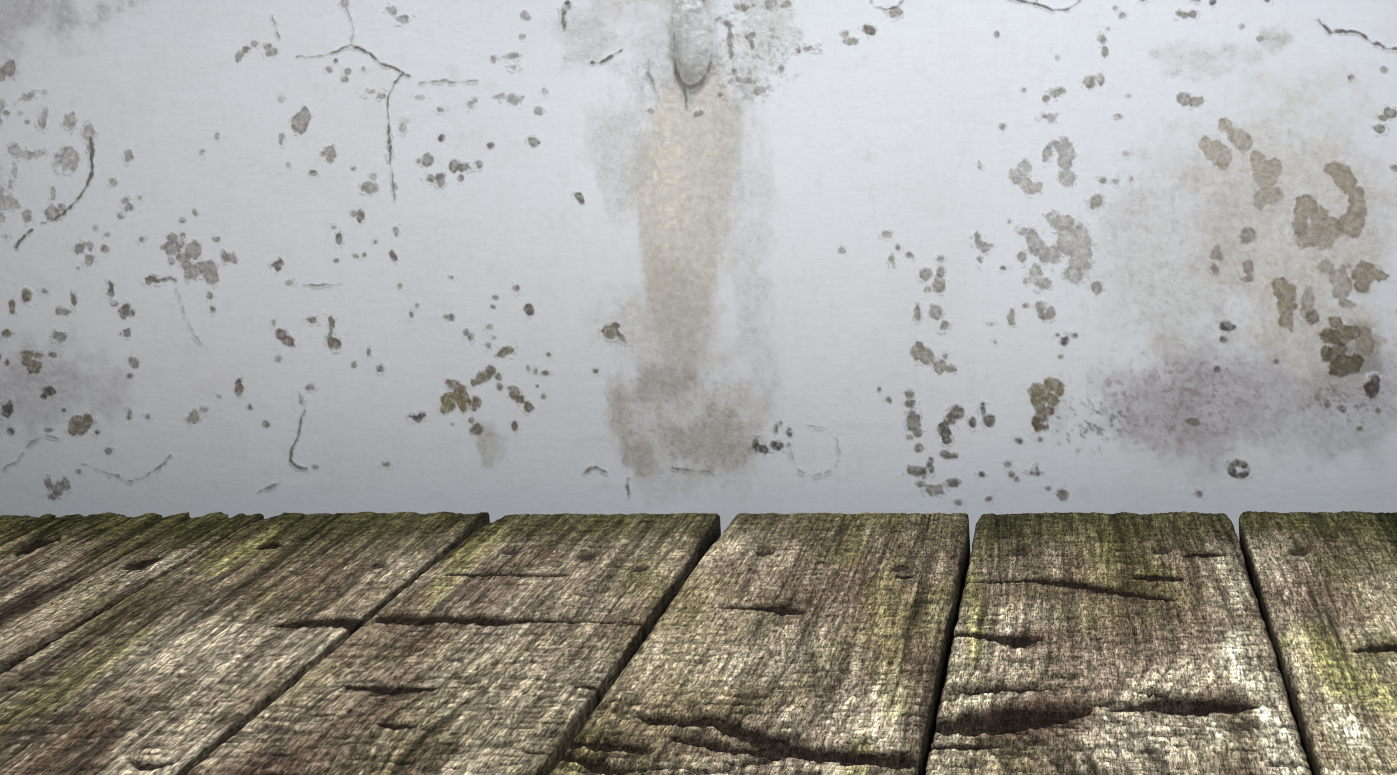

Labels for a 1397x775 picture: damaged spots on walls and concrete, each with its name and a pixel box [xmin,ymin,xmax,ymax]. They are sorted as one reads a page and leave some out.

crack [277,33,410,151]
crack [1017,0,1080,11]
crack [1322,24,1397,49]
crack [15,136,94,249]
water stain [608,72,739,356]
peeling [883,231,957,374]
peeling [990,177,1132,358]
peeling [1199,118,1389,411]
crack [266,409,308,489]
peeling [409,345,551,434]
peeling [878,387,995,505]
peeling [1016,377,1064,443]